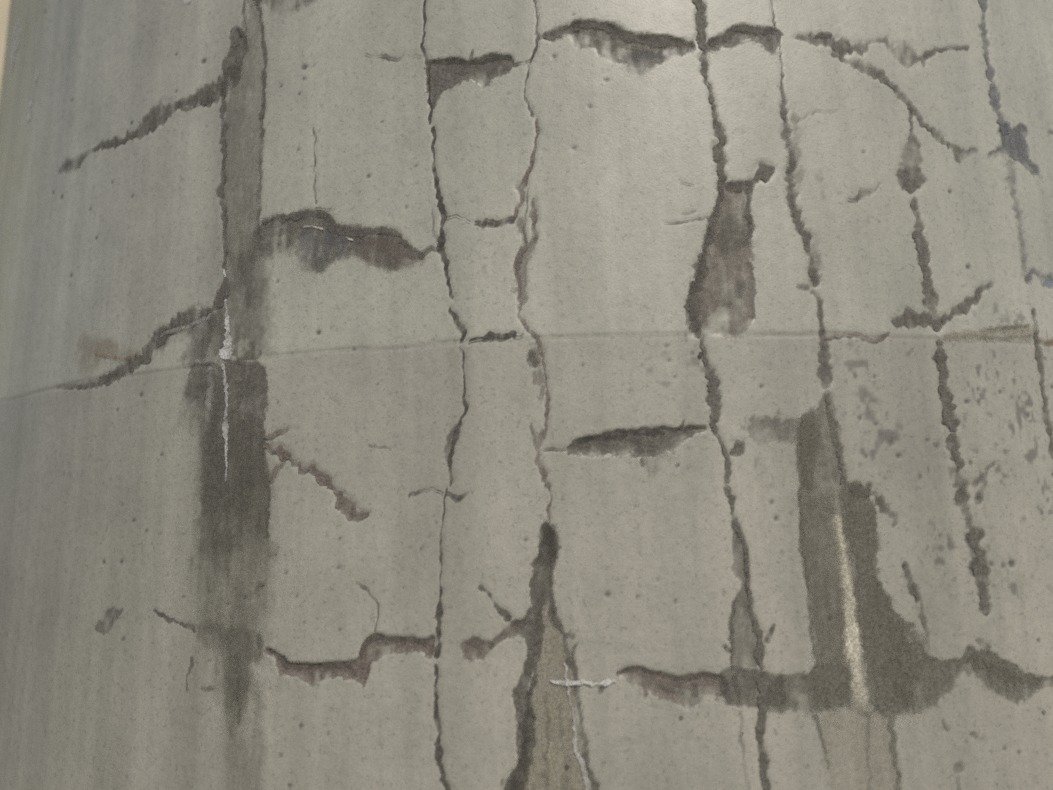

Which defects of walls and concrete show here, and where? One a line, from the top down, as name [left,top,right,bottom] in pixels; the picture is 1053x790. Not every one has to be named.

crack [58,63,241,172]
water stain [243,0,273,135]
spalling [424,49,534,108]
spalling [540,18,783,64]
water stain [186,27,440,552]
spalling [264,581,435,686]
crack [365,0,553,790]
water stain [501,522,617,790]
spalling [544,419,706,465]
crack [672,0,787,790]
water stain [767,394,1053,750]
crack [773,0,1053,615]